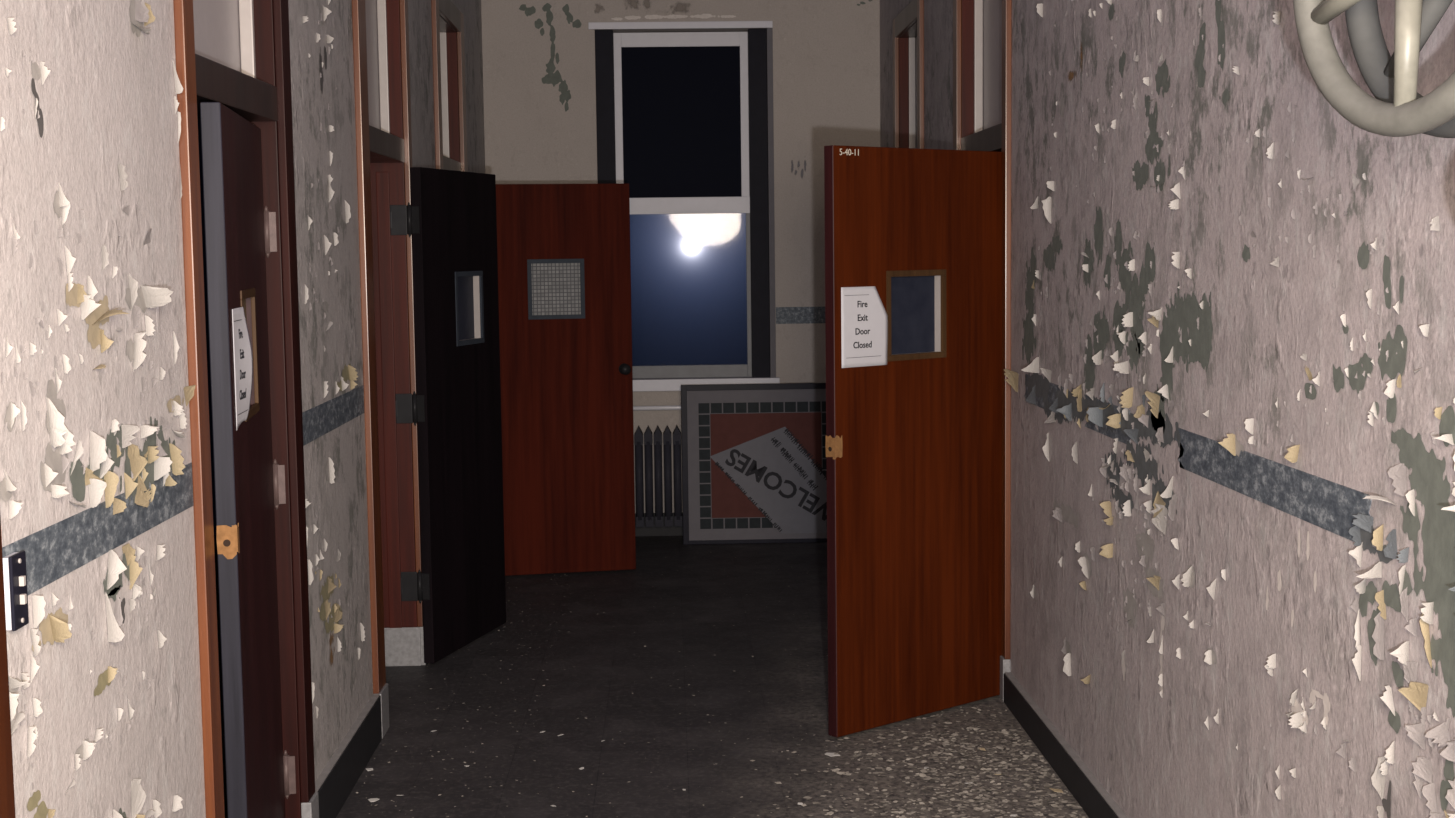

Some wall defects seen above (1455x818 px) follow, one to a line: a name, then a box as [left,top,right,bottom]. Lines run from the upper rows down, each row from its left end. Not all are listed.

spalling [172,60,183,143]
peeling [519,3,582,112]
peeling [305,151,351,352]
peeling [0,164,195,519]
peeling [324,363,359,398]
peeling [1003,97,1226,659]
peeling [1218,225,1455,818]
peeling [103,543,167,648]
peeling [306,525,365,660]
peeling [9,593,73,818]
peeling [65,666,156,794]
peeling [113,779,183,818]